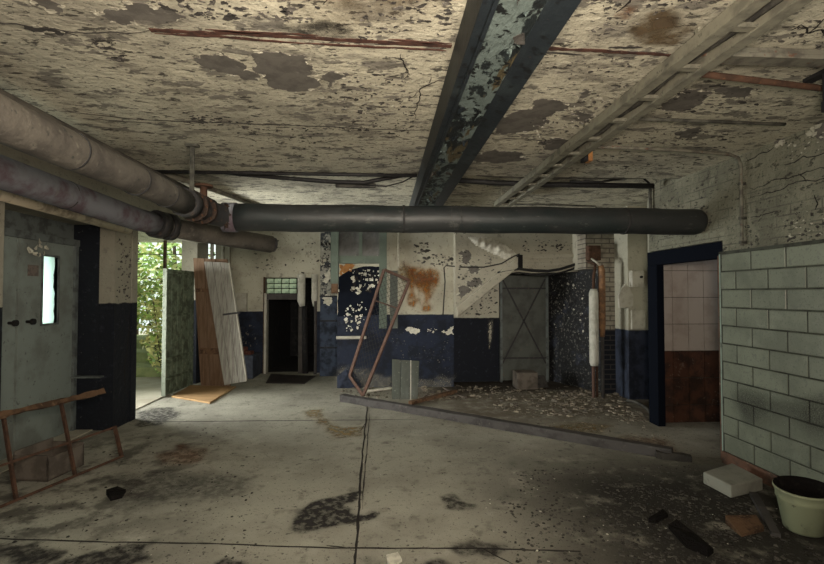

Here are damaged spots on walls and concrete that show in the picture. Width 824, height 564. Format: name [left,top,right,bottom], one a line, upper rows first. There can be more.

water stain [631,10,688,45]
crack [0,22,452,130]
peeling [473,149,526,163]
crack [748,153,824,222]
peeling [252,240,379,331]
rust [398,267,439,311]
crack [0,407,581,564]